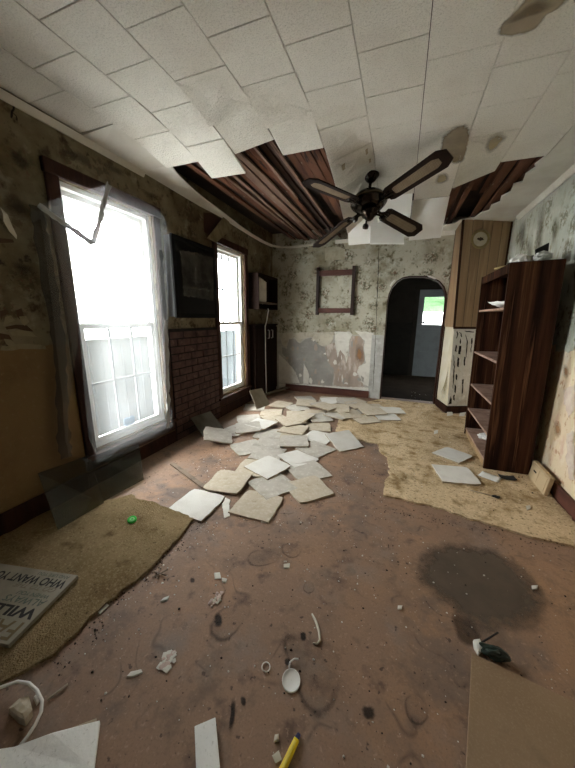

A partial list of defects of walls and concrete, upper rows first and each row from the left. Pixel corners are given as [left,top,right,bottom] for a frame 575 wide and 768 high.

water stain [499,0,566,36]
water stain [441,126,469,163]
flaking render [185,140,344,241]
flaking render [436,156,544,224]
peeling [278,331,374,391]
water stain [421,546,544,644]